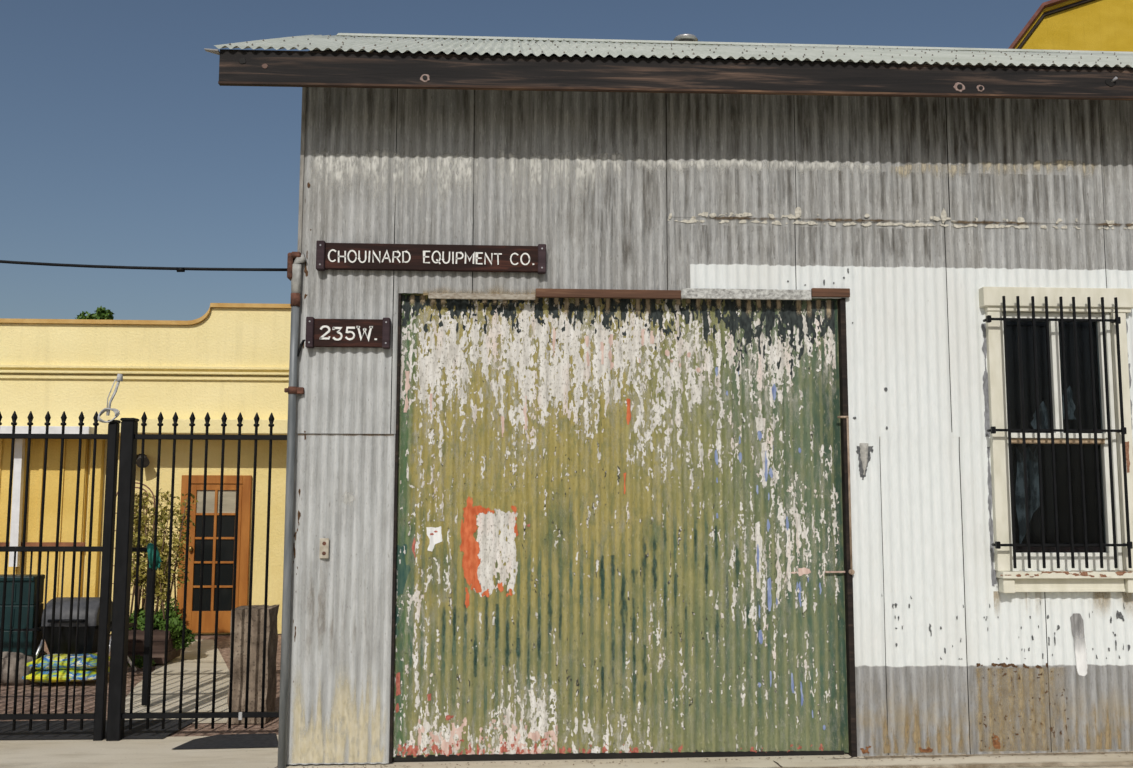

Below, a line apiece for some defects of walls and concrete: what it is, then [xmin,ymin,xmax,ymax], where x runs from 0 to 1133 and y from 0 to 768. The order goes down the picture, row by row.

damp [313,150,478,197]
damp [500,151,879,188]
damp [879,97,1103,175]
peeling [393,295,840,757]
peeling [1092,607,1130,659]
corrosion [976,663,1122,752]